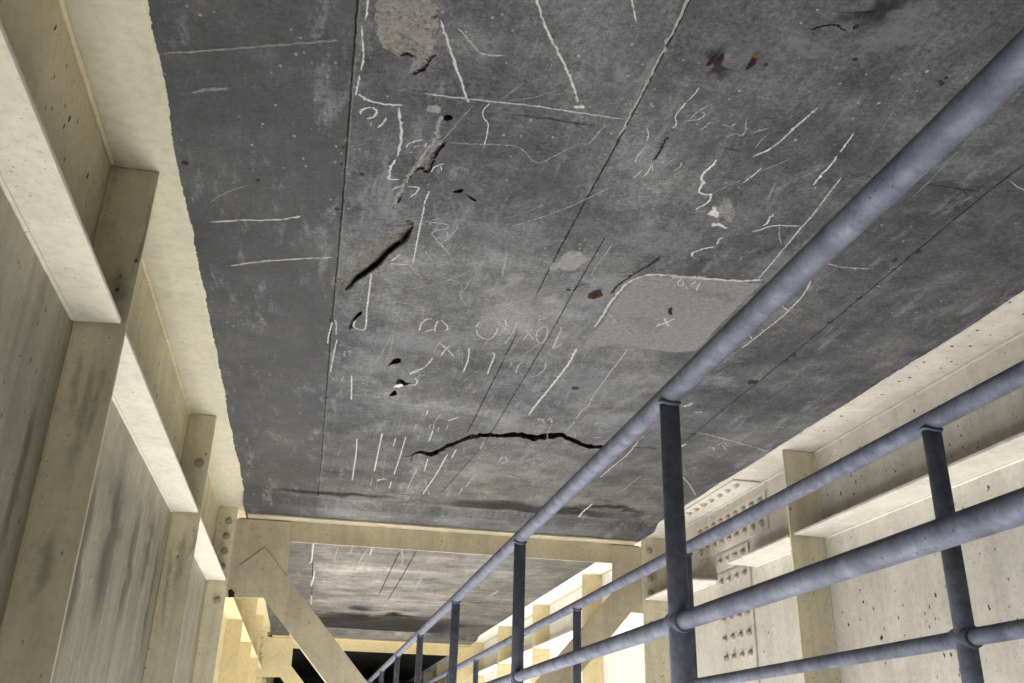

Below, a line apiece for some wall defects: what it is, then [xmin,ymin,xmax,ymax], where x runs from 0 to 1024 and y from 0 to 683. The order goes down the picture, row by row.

spalling [374,0,440,76]
spalling [331,105,446,291]
crack [404,428,603,460]